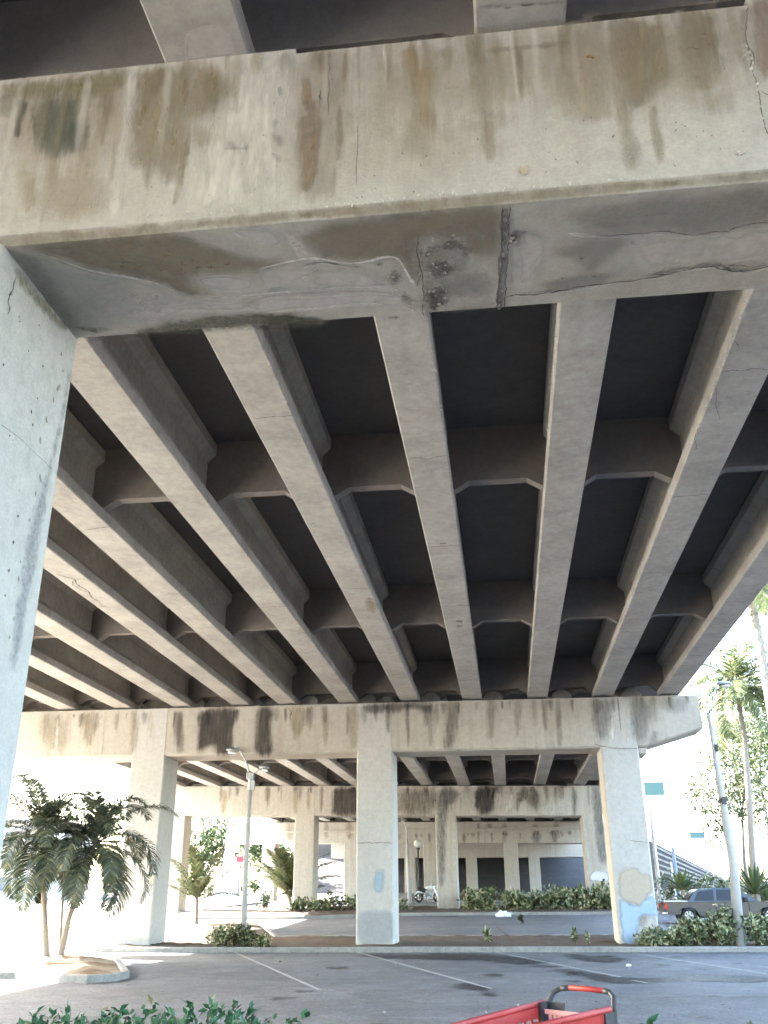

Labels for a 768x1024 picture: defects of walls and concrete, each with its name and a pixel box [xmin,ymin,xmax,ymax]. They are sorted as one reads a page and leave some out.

leakage [2,67,220,168]
crack [745,2,768,134]
crack [496,206,768,312]